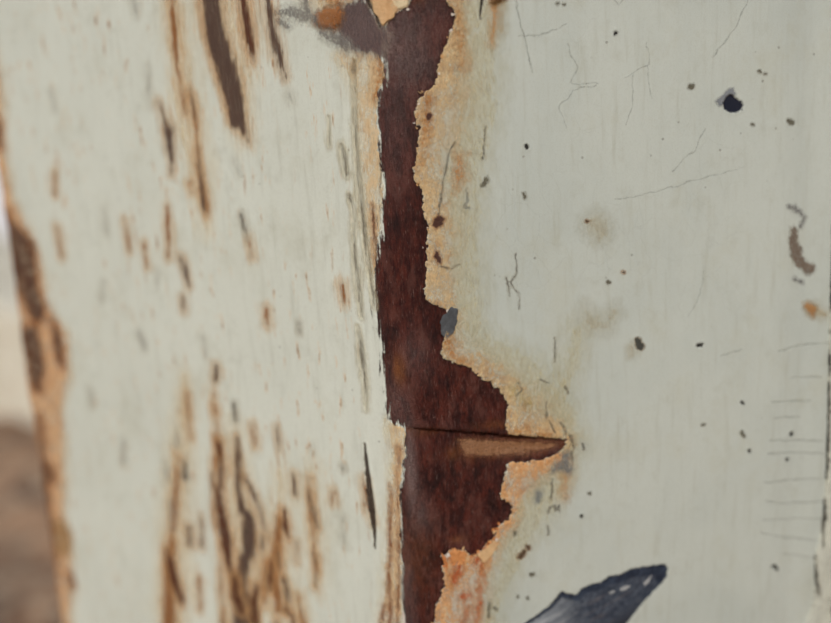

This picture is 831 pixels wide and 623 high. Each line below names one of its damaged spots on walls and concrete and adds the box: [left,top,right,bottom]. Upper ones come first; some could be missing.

rust [170,0,210,214]
rust [198,0,249,142]
rust [238,0,255,61]
rust [266,0,287,79]
rust [412,0,465,320]
rust [0,102,76,623]
rust [163,455,188,623]
rust [210,364,306,623]
peeling [332,0,568,623]
rust [435,331,572,623]
crack [814,499,827,596]
crack [823,354,831,479]